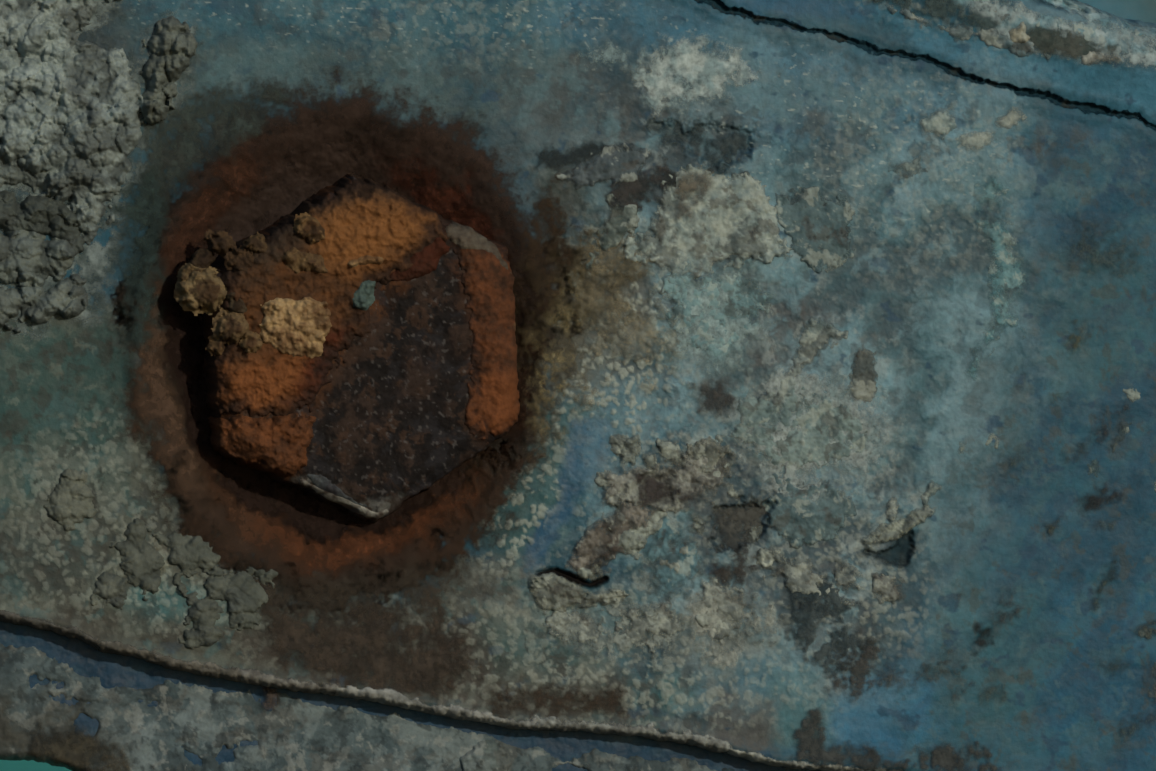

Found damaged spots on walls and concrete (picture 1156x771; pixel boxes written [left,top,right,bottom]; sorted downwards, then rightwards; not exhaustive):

crack [695,0,1156,130]
peeling [873,0,1156,66]
corrosion [121,85,575,697]
peeling [538,109,899,587]
peeling [862,482,942,604]
corrosion [489,682,626,714]
spalling [778,582,881,697]